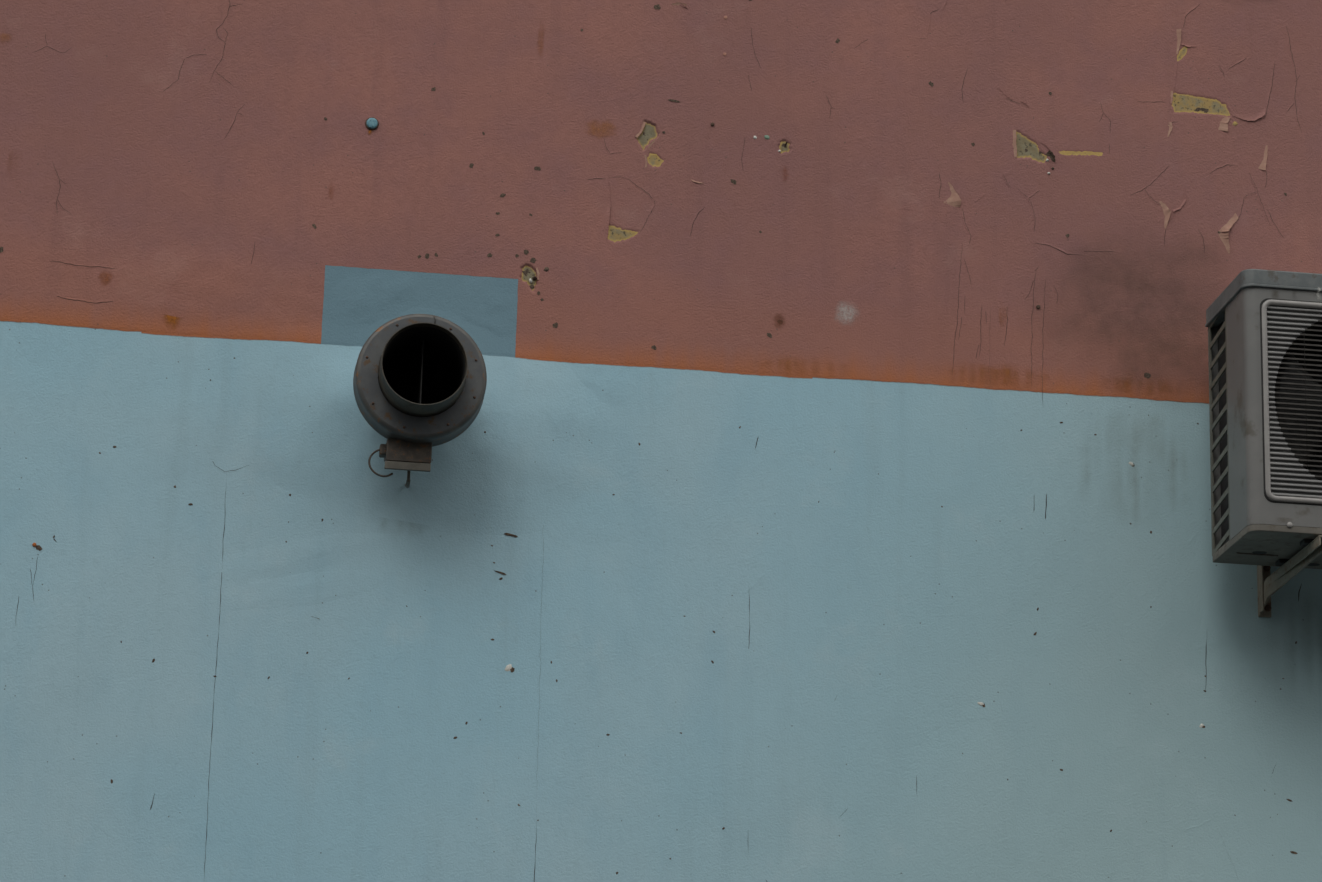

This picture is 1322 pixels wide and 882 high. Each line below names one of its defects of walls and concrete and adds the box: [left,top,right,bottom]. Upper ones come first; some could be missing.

peeling [1139,3,1275,137]
spalling [635,122,665,168]
spalling [1012,130,1055,174]
crack [951,245,1008,374]